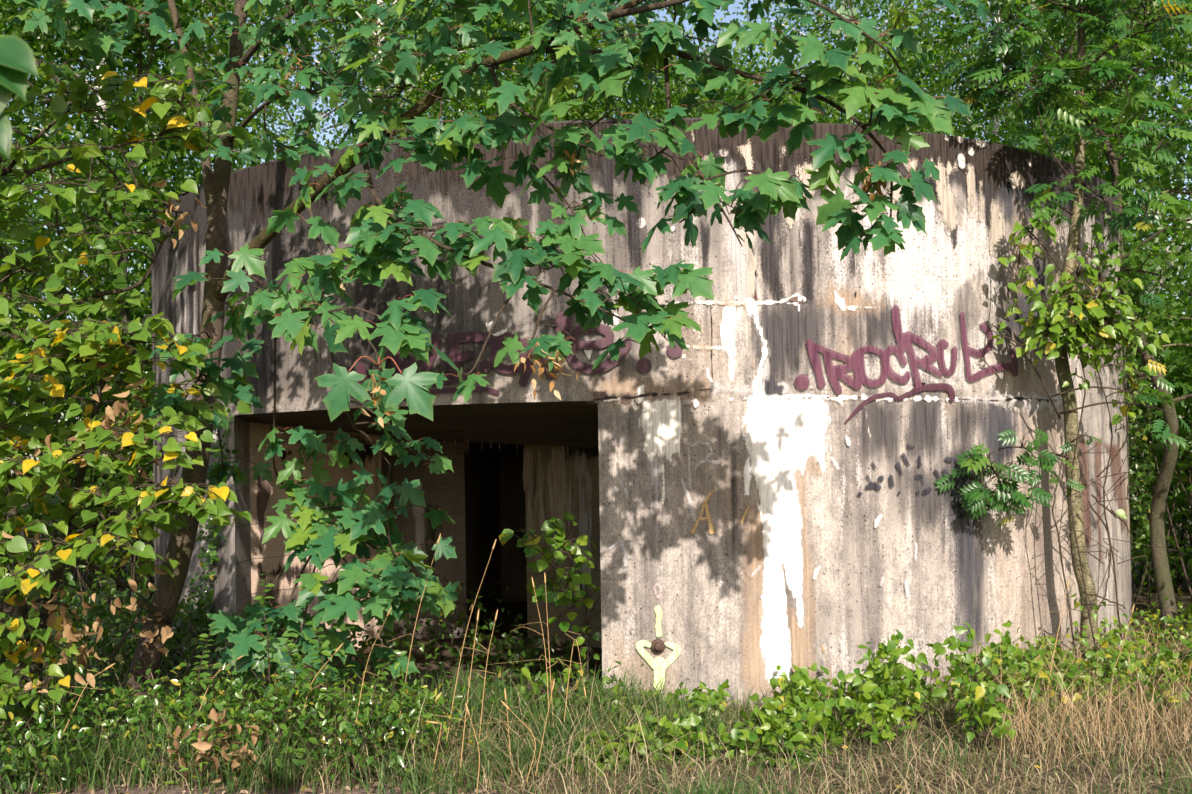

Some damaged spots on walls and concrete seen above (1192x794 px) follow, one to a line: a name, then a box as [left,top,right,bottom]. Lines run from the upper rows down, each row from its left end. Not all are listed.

leakage [720,209,1018,683]
leakage [1006,245,1050,339]